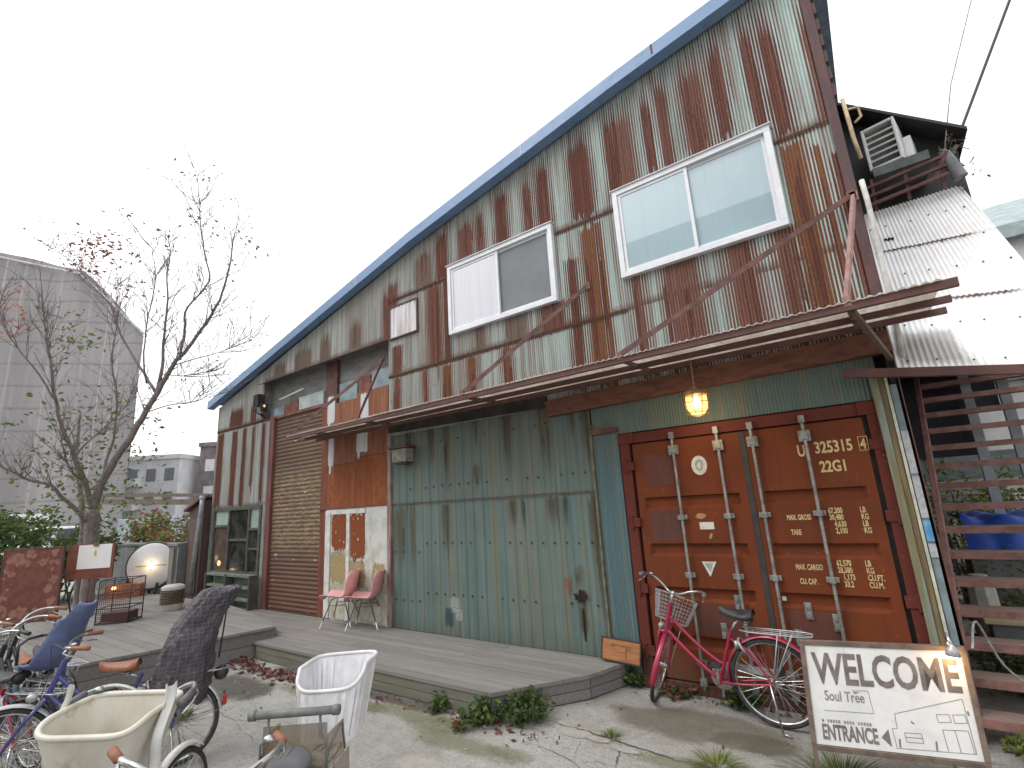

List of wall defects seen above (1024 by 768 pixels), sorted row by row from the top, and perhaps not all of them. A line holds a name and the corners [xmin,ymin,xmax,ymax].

corrosion [383,0,871,410]
corrosion [294,330,332,371]
corrosion [350,319,361,349]
corrosion [213,406,270,509]
peeling [330,513,385,590]